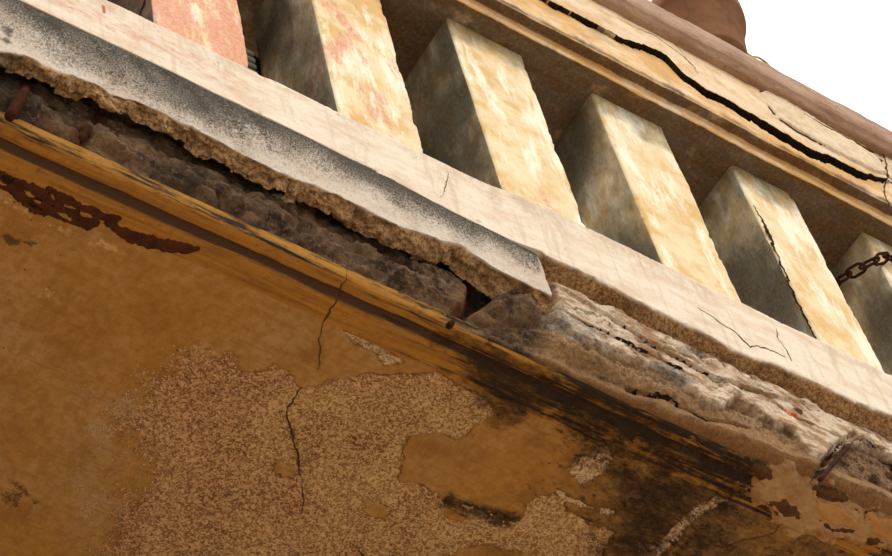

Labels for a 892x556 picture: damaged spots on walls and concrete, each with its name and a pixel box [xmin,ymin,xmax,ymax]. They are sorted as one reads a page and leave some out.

spalling [0,67,27,113]
crack [540,0,892,211]
crack [318,276,347,369]
spalling [0,77,892,516]
crack [697,307,792,361]
crack [286,387,305,513]
flaking render [74,328,615,556]
leakage [438,330,753,556]
peeling [636,496,728,556]